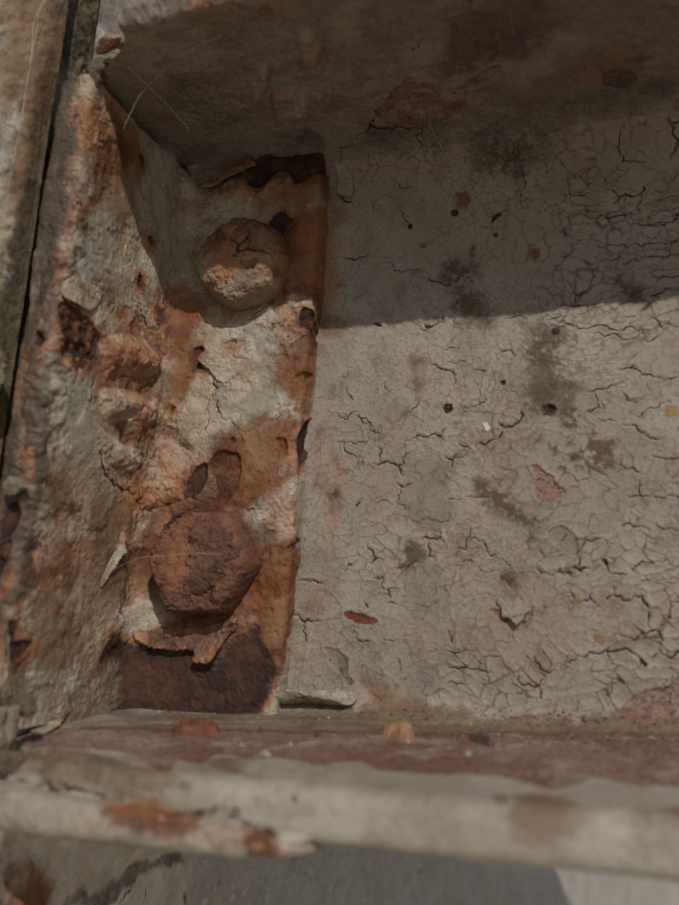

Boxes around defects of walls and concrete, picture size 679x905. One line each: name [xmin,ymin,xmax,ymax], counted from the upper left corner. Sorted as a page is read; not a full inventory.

corrosion [270,173,330,326]
crack [550,119,679,342]
corrosion [170,297,205,390]
corrosion [140,416,299,658]
corrosion [271,338,317,409]
crack [337,375,524,609]
crack [585,364,679,499]
crack [448,633,497,685]
crack [517,522,679,699]
peeling [15,673,679,789]
corrosion [108,799,197,832]
corrosion [8,865,47,905]